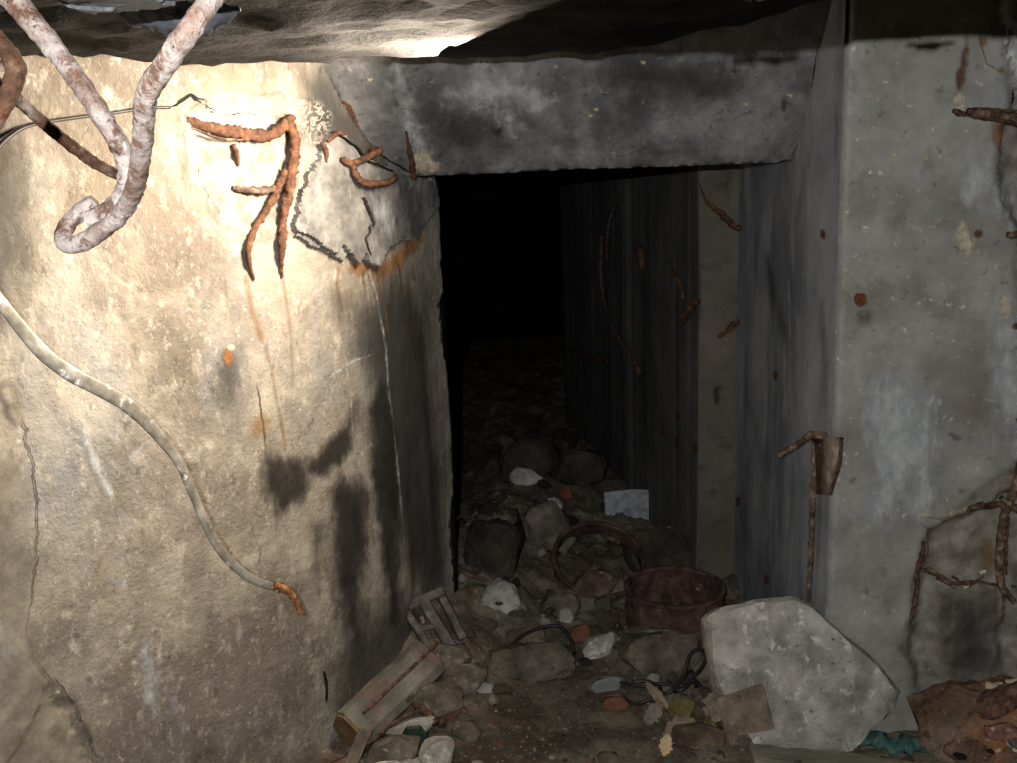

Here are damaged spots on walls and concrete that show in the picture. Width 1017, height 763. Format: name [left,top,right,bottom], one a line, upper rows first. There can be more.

rust [954,48,1017,146]
spalling [1002,26,1017,109]
spalling [172,92,440,266]
spalling [994,124,1017,229]
rust [351,234,422,286]
spalling [900,457,1017,692]